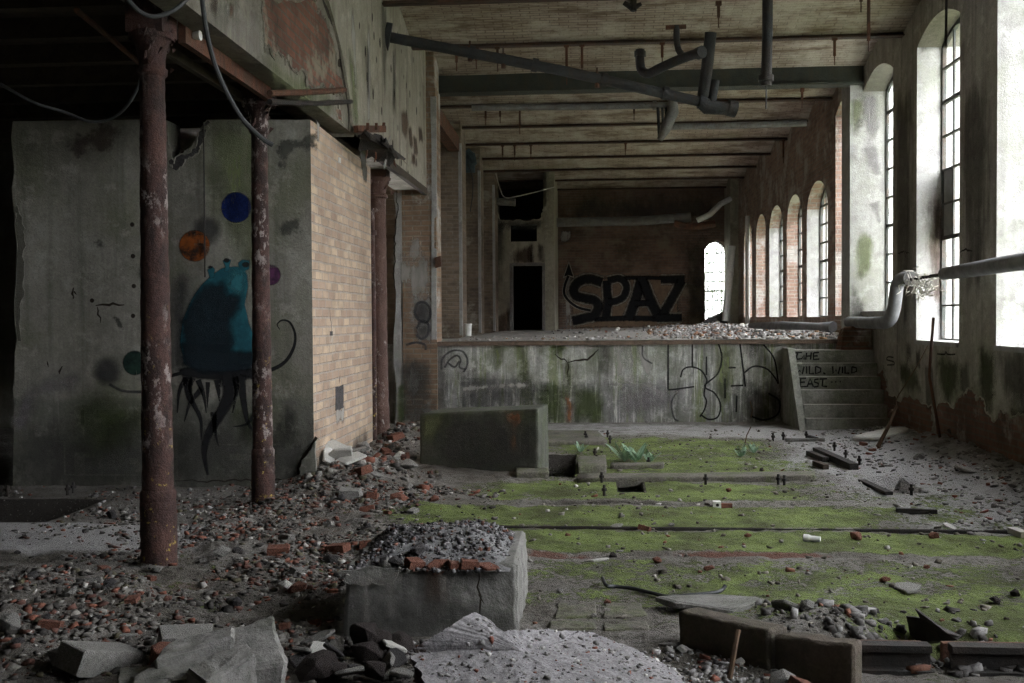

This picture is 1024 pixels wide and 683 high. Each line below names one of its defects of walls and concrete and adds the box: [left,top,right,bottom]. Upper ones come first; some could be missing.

spalling [261,0,346,124]
spalling [877,365,1024,465]